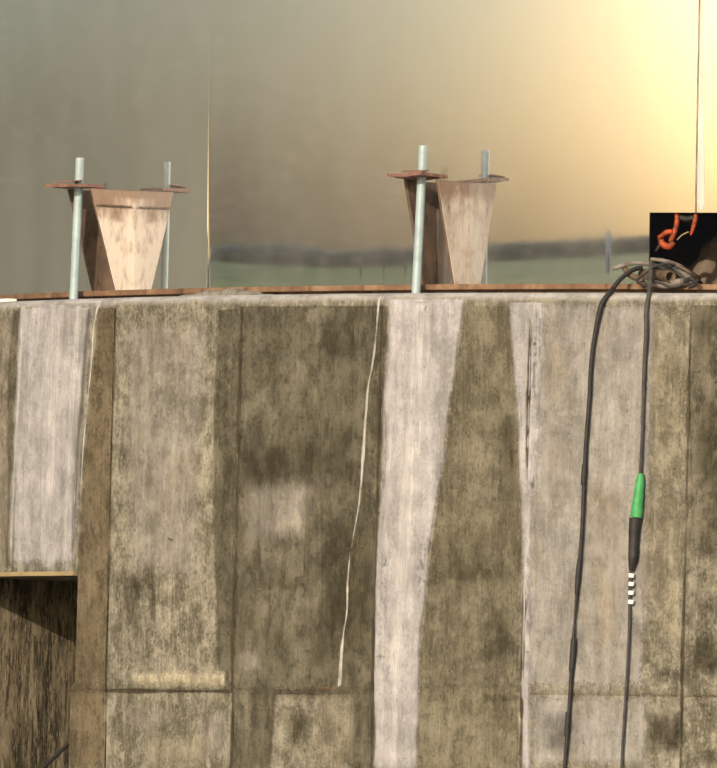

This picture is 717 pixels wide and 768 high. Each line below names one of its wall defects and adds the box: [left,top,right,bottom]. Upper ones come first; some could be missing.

leakage [0,302,116,768]
leakage [123,578,152,627]
leakage [131,382,197,575]
leakage [214,295,717,768]
leakage [147,722,217,765]